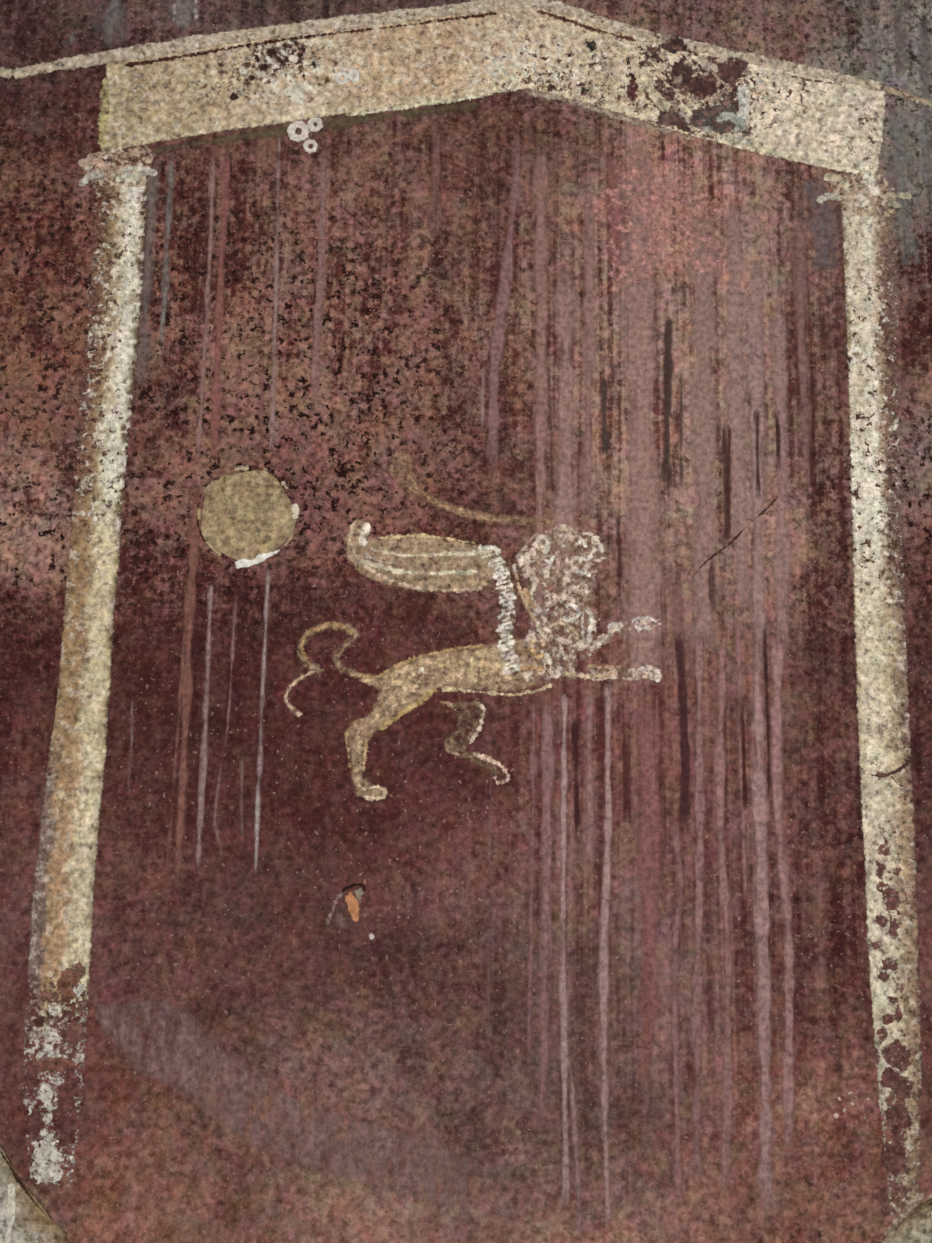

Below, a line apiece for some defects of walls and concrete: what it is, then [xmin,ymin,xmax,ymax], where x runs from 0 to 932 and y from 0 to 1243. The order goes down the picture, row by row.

peeling [625,36,769,144]
flaking render [326,883,366,927]
peeling [869,844,901,982]
peeling [25,962,87,1183]
peeling [873,996,914,1179]
flaking render [0,1146,68,1243]
flaking render [882,1192,932,1243]